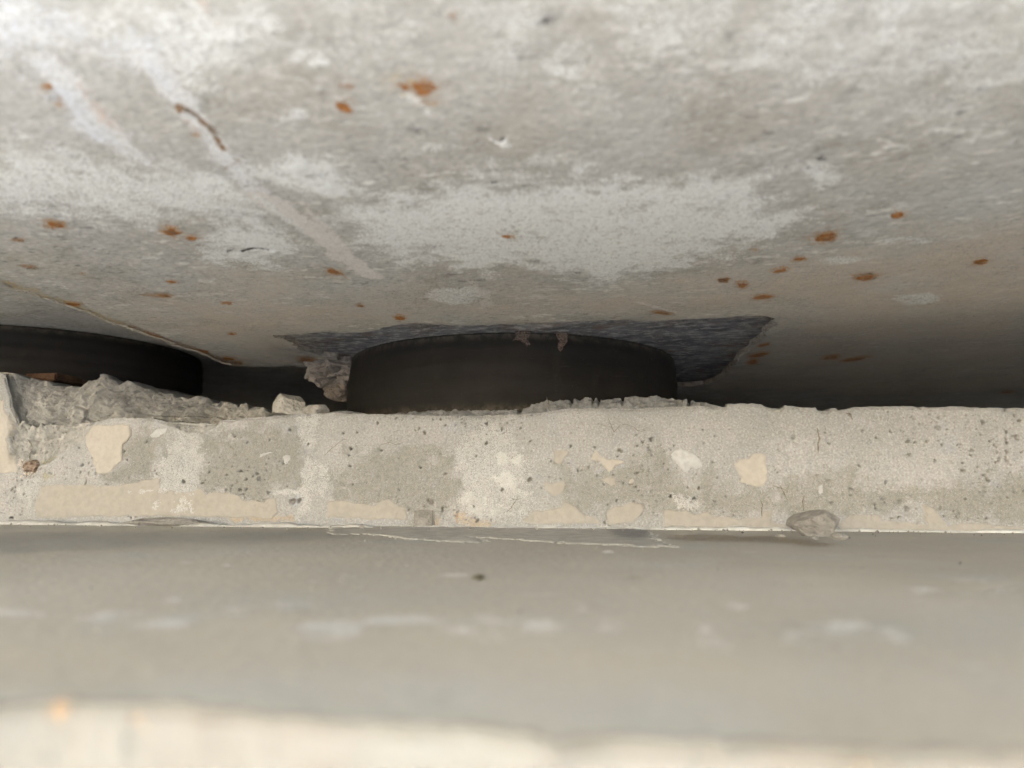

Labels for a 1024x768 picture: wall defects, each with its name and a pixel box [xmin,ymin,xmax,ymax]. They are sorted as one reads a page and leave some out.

corrosion [334,80,357,116]
corrosion [370,68,455,106]
corrosion [173,103,241,171]
corrosion [38,217,74,230]
corrosion [158,224,203,241]
corrosion [769,225,844,275]
corrosion [716,275,776,301]
corrosion [848,270,885,284]